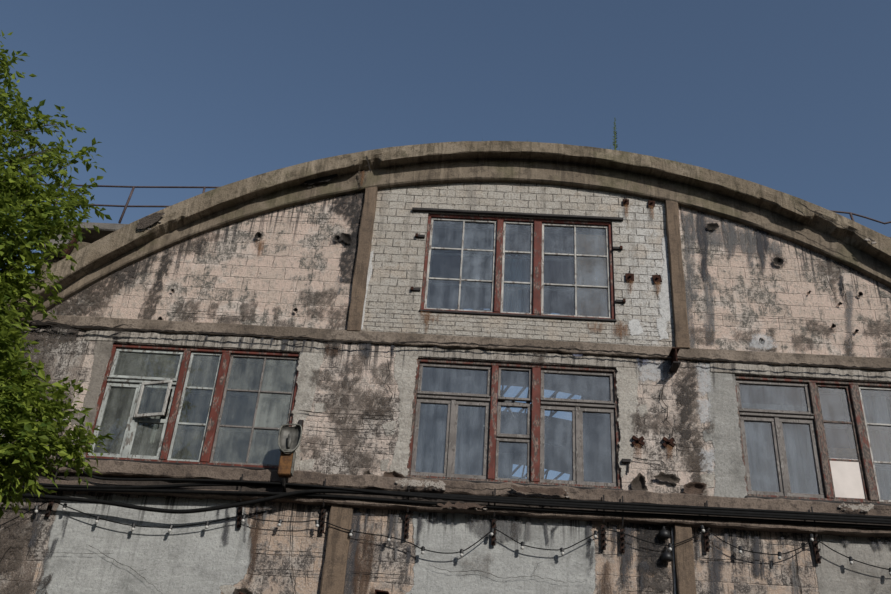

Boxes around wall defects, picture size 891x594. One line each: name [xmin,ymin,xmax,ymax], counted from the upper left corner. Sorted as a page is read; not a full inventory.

water stain [50,229,227,320]
water stain [175,299,257,324]
water stain [300,170,367,330]
water stain [681,211,782,348]
water stain [792,320,834,350]
water stain [819,260,870,356]
water stain [864,318,891,358]
water stain [301,342,395,475]
water stain [631,357,714,495]
crack [85,545,160,592]
water stain [612,523,674,591]
water stain [694,528,774,594]